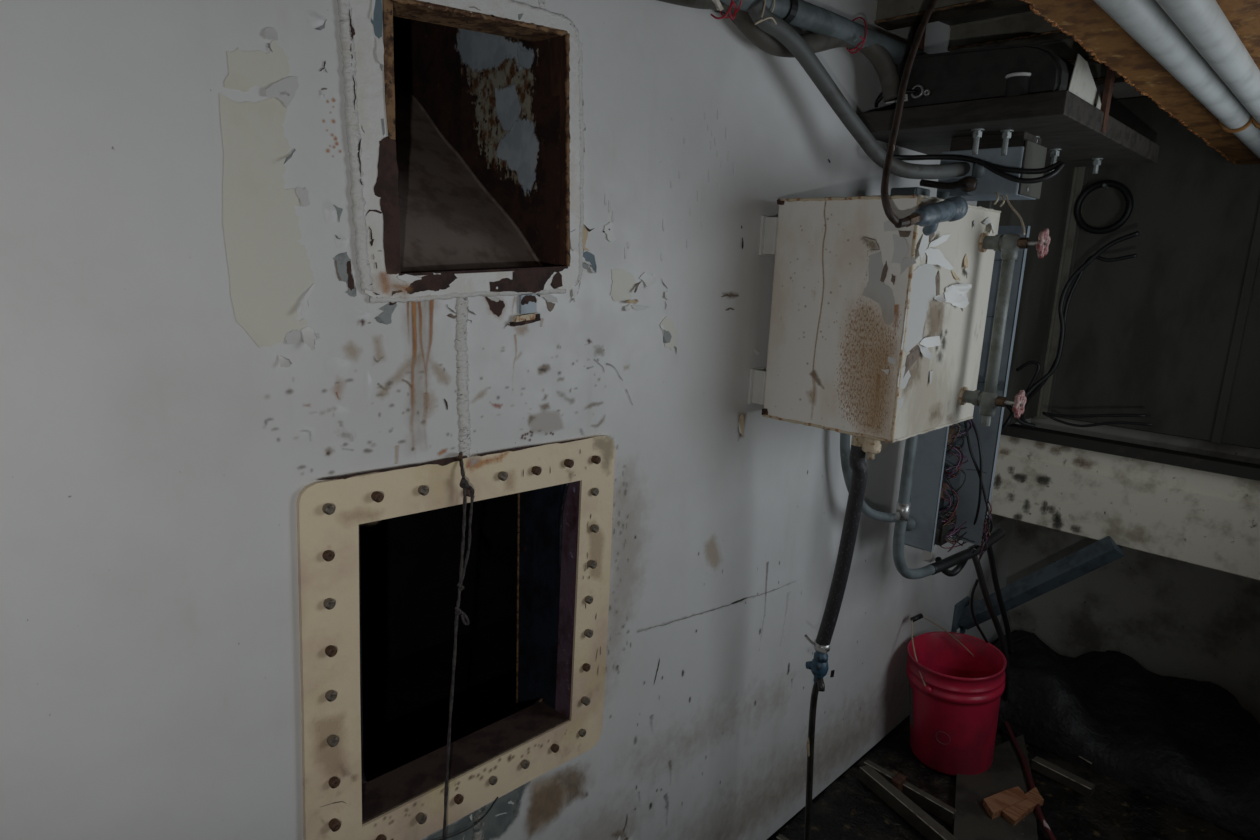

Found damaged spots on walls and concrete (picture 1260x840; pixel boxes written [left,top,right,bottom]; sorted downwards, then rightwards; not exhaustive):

rust [374,0,571,388]
peeling [570,215,677,353]
peeling [375,302,397,325]
leakage [994,467,1050,486]
leakage [1014,500,1079,532]
peeling [426,782,529,840]